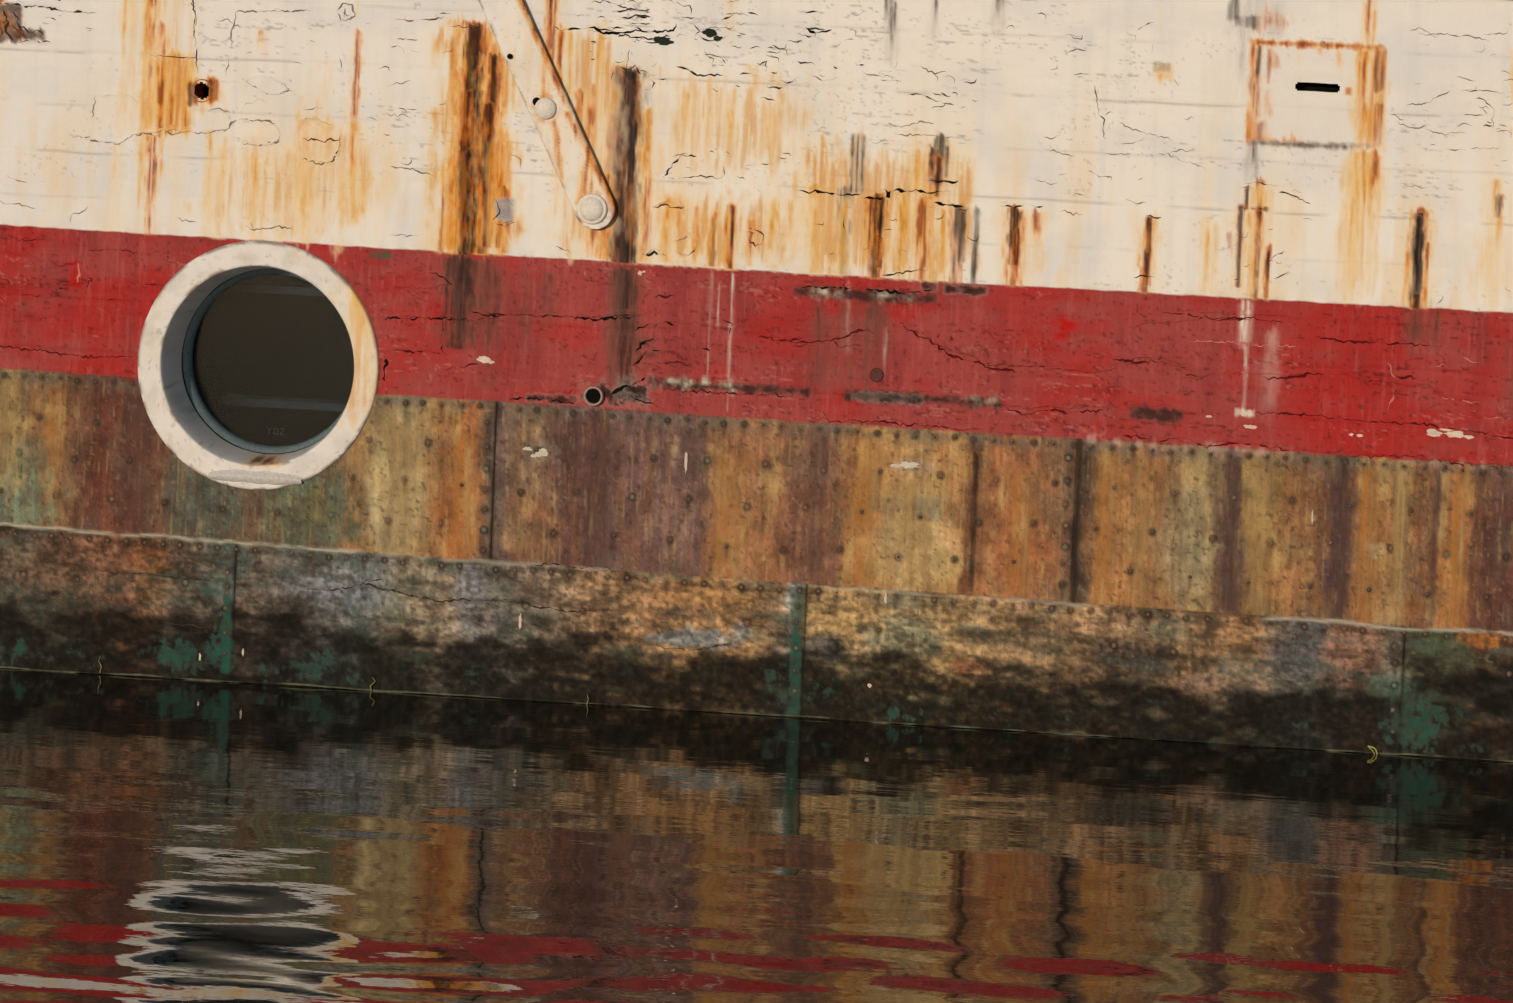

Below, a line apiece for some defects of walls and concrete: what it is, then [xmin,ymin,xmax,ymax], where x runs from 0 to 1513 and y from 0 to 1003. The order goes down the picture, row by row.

peeling [0,0,60,49]
peeling [69,105,347,165]
corrosion [100,0,1055,558]
crack [556,0,982,276]
crack [1002,12,1199,219]
corrosion [1193,171,1285,302]
crack [1226,182,1311,280]
corrosion [1241,0,1513,315]
water stain [0,381,637,575]
water stain [0,425,1513,761]
corrosion [840,435,953,592]
crack [1253,336,1513,439]